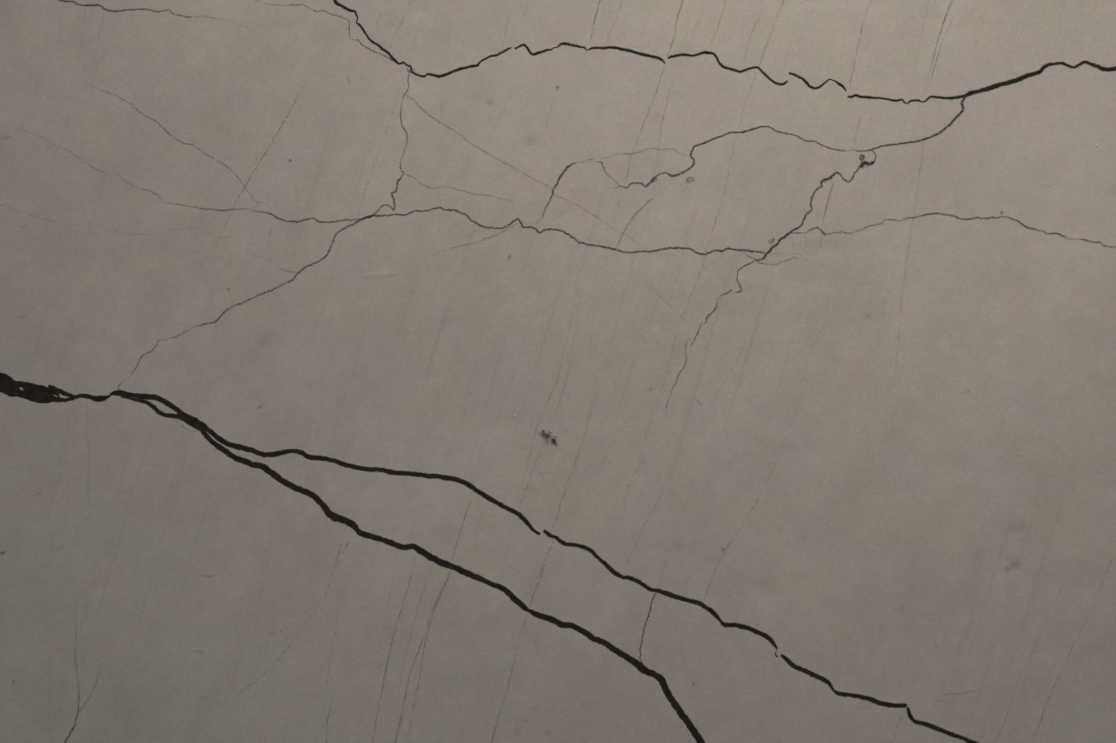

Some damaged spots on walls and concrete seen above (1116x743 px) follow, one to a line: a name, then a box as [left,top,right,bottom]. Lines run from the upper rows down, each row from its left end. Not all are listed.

crack [61,0,186,17]
crack [202,0,1116,331]
crack [0,344,979,743]